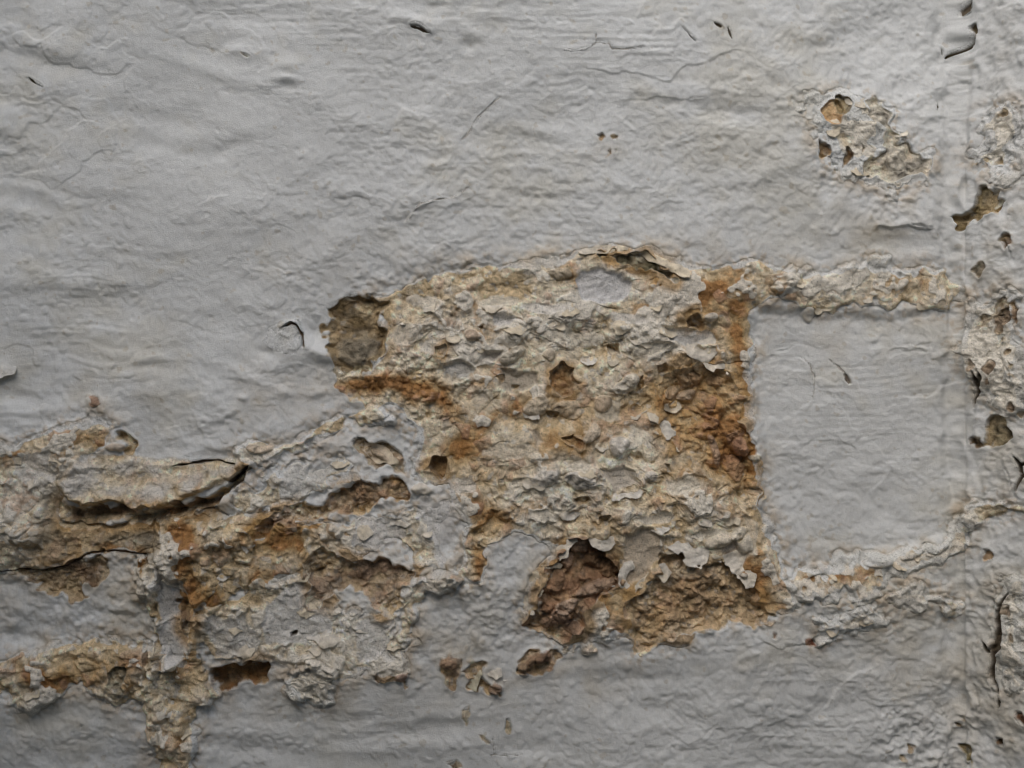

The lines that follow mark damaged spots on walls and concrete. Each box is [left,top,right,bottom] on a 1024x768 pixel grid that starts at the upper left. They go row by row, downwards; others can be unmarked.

flaking render [791,87,936,202]
flaking render [951,99,1024,232]
peeling [970,261,986,278]
peeling [998,232,1011,249]
flaking render [951,285,1024,448]
flaking render [0,243,802,708]
crack [0,549,148,572]
crack [981,592,1009,709]